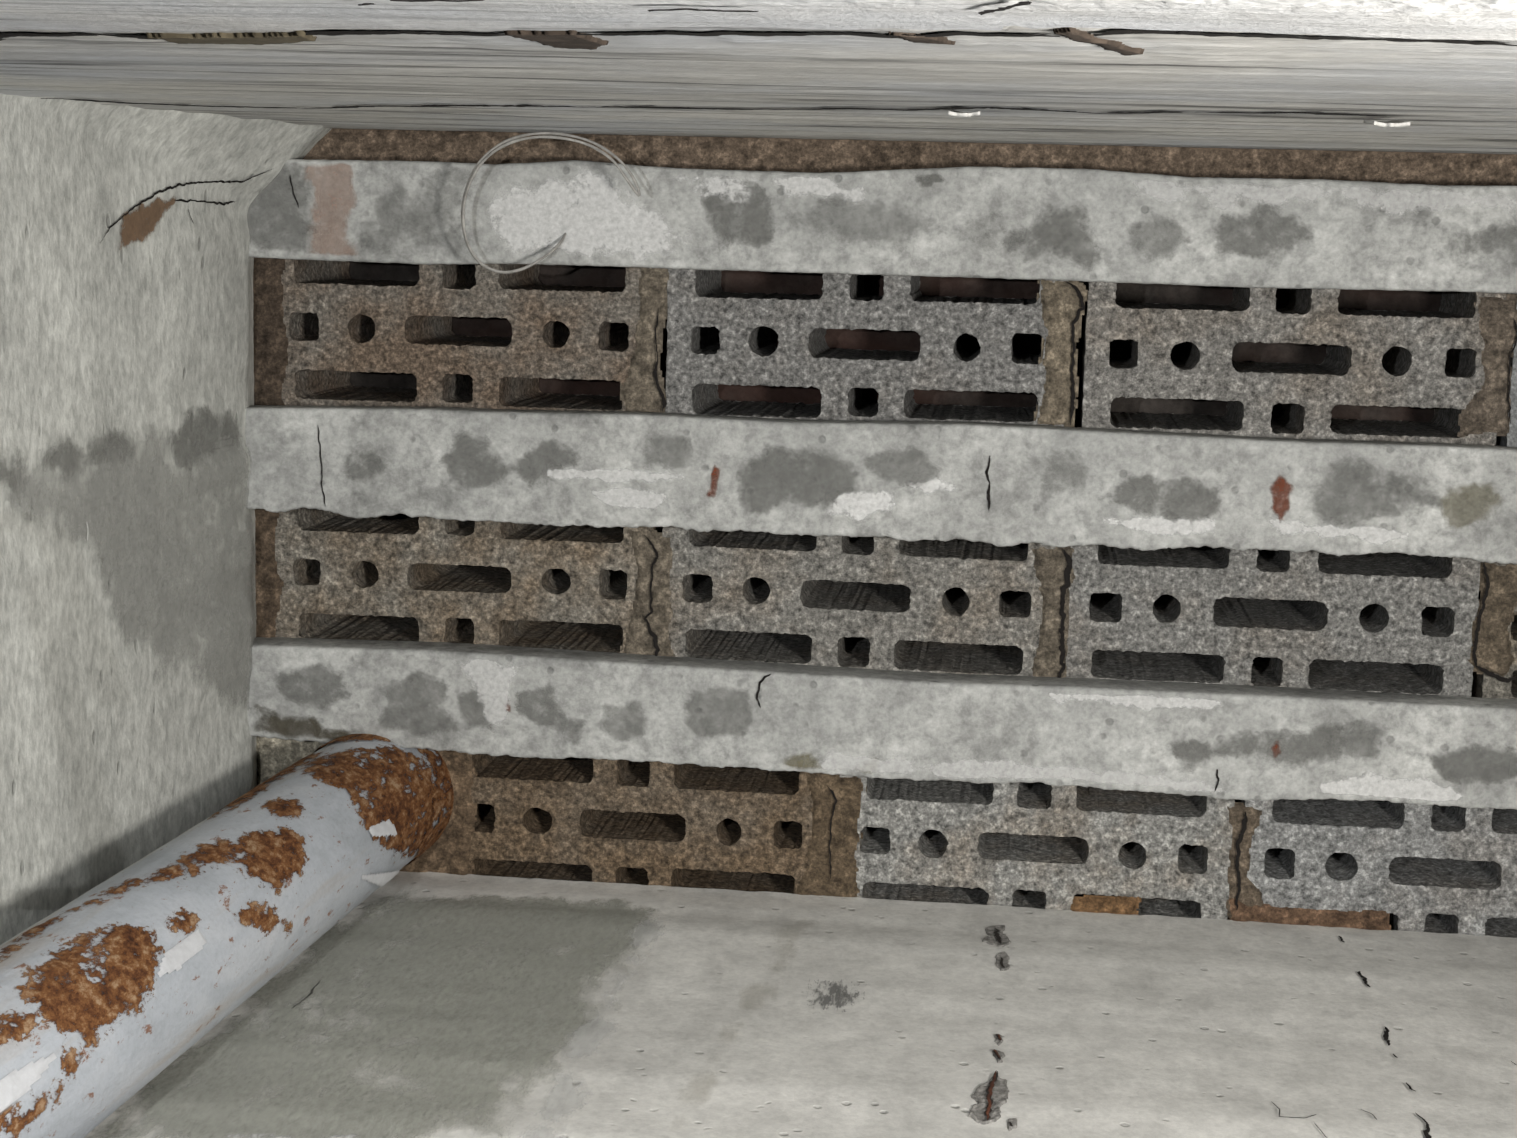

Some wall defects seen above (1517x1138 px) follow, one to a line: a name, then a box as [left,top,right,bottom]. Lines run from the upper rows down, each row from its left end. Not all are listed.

peeling [0,0,1517,127]
crack [644,535,660,656]
crack [1473,562,1517,683]
crack [1235,812,1248,910]
leakage [101,893,656,1138]
crack [1339,936,1370,987]
crack [1271,1101,1327,1138]
crack [1383,1026,1432,1138]